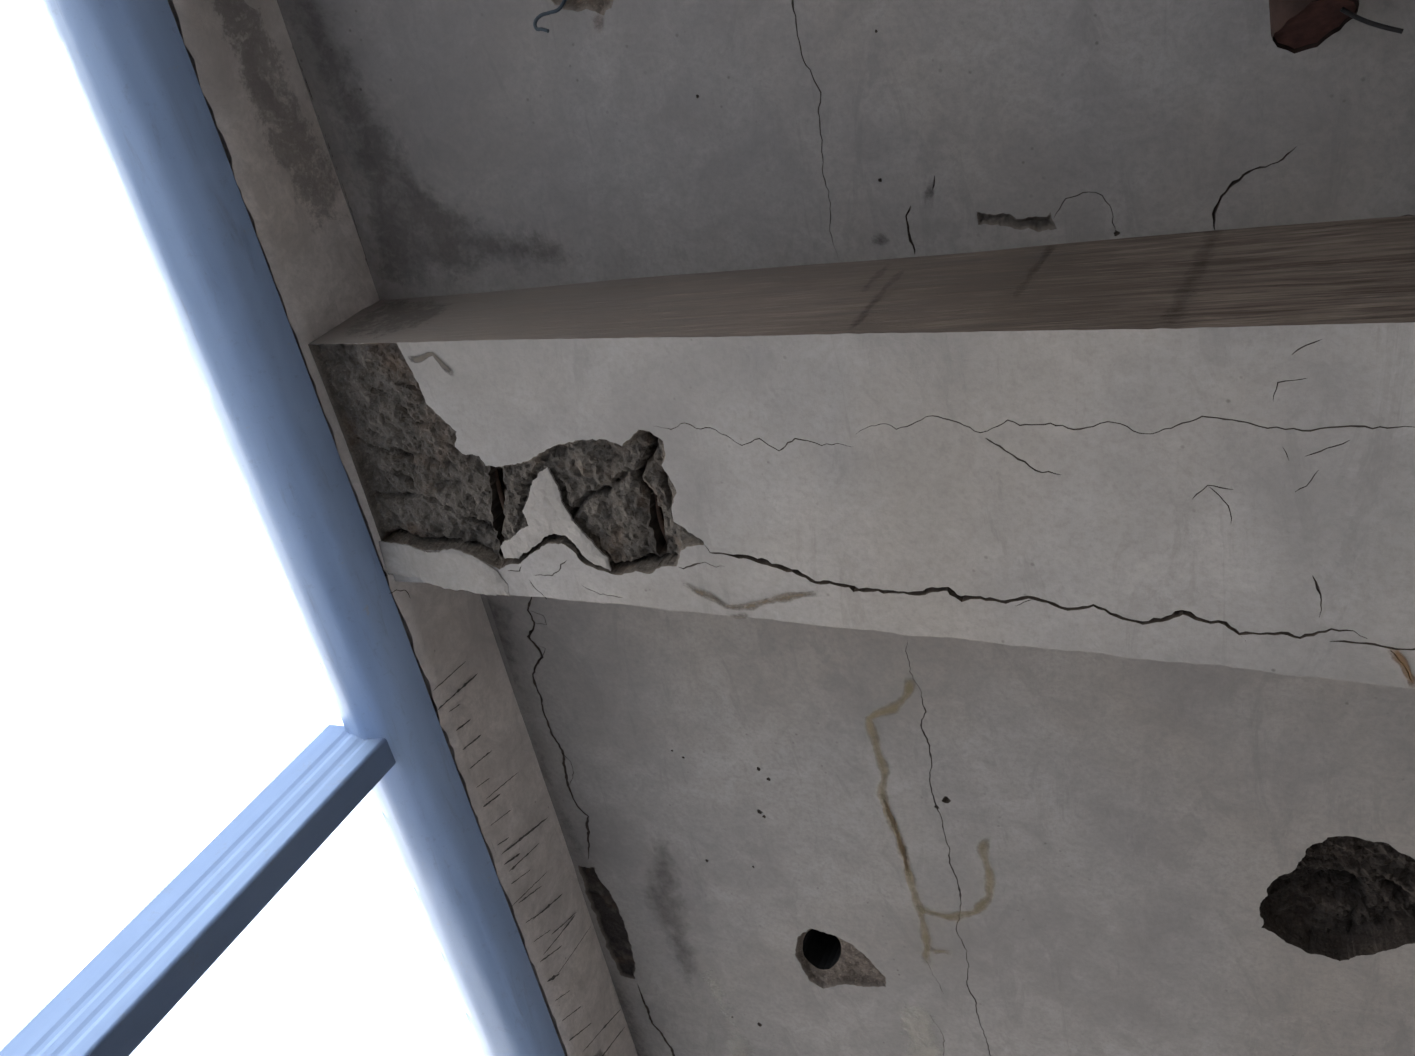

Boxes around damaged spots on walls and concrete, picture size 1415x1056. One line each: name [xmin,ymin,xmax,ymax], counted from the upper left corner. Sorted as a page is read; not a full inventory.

crack [791,0,838,256]
flaking render [977,212,1057,232]
crack [1212,146,1297,230]
spalling [308,343,704,575]
crack [667,339,1411,491]
crack [1193,485,1233,521]
crack [679,543,1415,654]
crack [509,560,620,859]
peeling [578,866,636,979]
water stain [866,682,993,959]
crack [905,647,991,1056]
crack [638,986,675,1056]